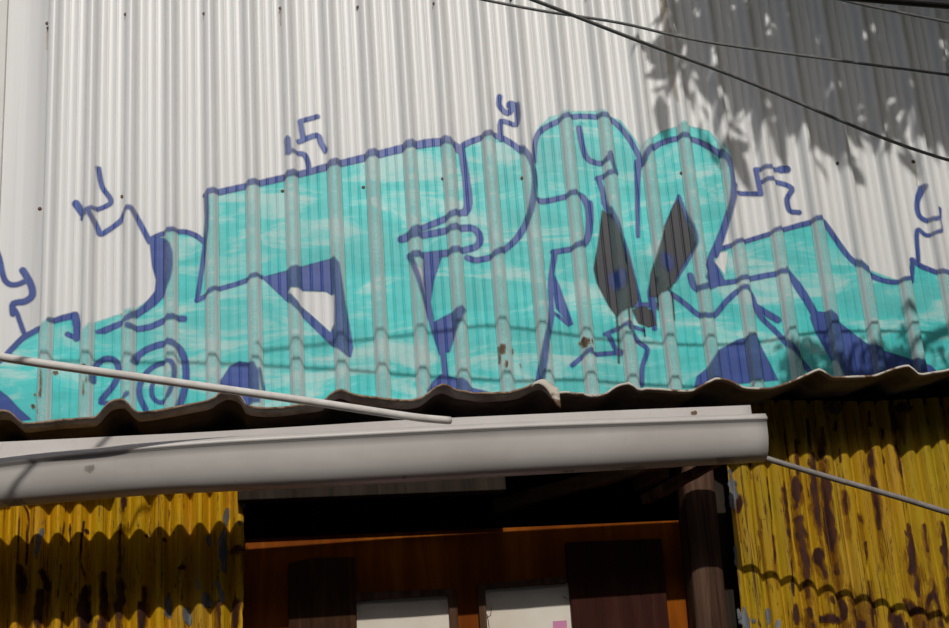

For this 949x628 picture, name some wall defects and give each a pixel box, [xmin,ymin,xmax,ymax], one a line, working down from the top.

rust [497,343,514,367]
rust [0,369,223,425]
rust [324,383,532,402]
peeling [728,469,738,510]
rust [735,495,743,543]
rust [766,399,949,628]
peeling [34,522,44,559]
rust [7,497,150,628]
peeling [196,508,241,608]
peeling [164,592,192,626]
rust [214,597,242,628]
peeling [737,607,781,628]